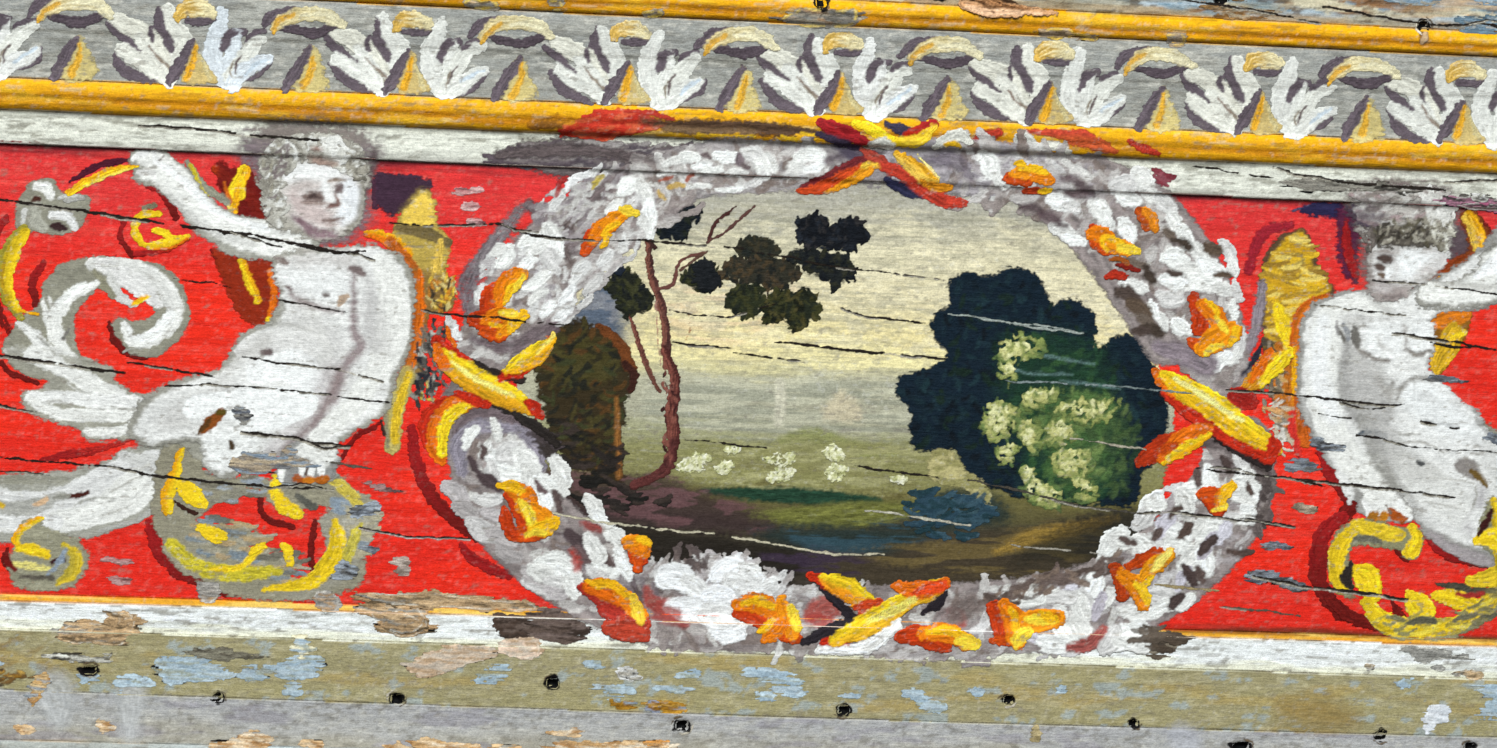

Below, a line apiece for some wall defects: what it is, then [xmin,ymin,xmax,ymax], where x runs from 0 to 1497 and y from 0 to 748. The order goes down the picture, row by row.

crack [0,198,375,262]
crack [174,278,230,288]
crack [278,299,345,313]
crack [390,222,1084,362]
crack [1314,279,1497,351]
peeling [348,481,403,519]
peeling [196,582,222,603]
peeling [312,546,547,685]
peeling [23,610,328,707]
peeling [382,660,702,748]
peeling [739,667,809,702]
peeling [901,687,948,714]